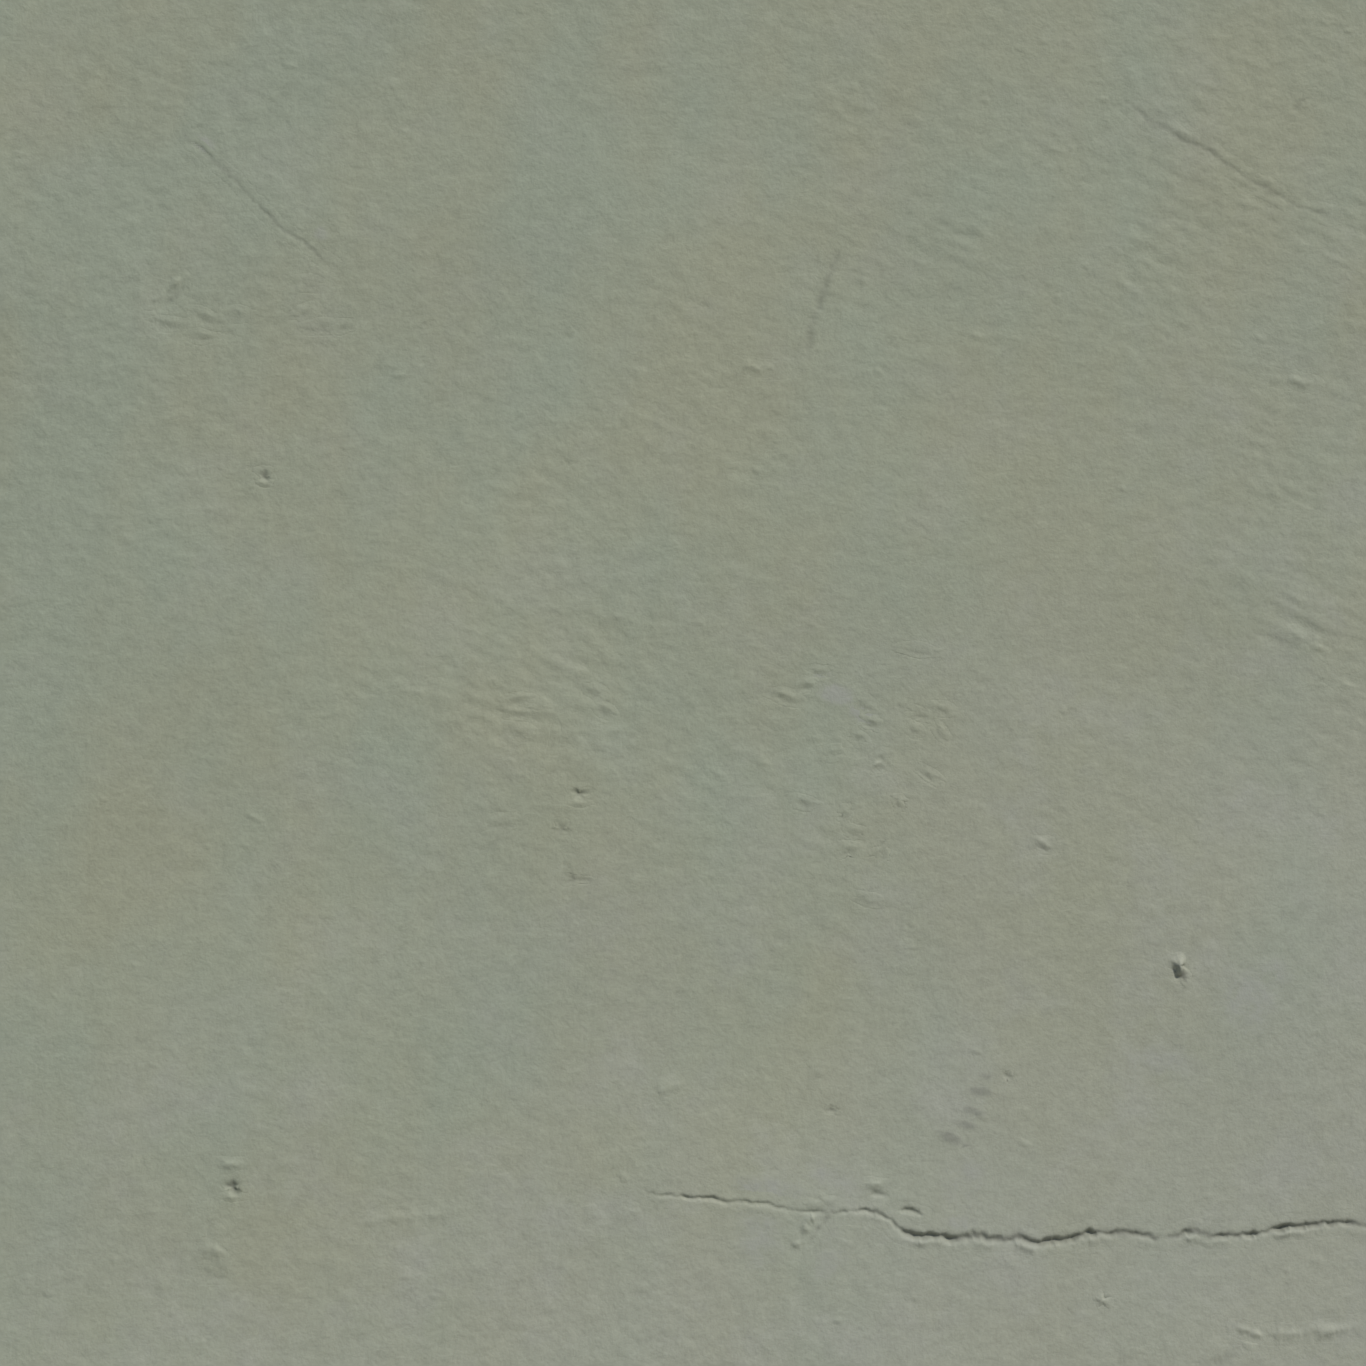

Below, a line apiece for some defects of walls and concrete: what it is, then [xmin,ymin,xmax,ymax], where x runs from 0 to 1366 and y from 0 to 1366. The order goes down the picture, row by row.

crack [623,1174,1366,1262]